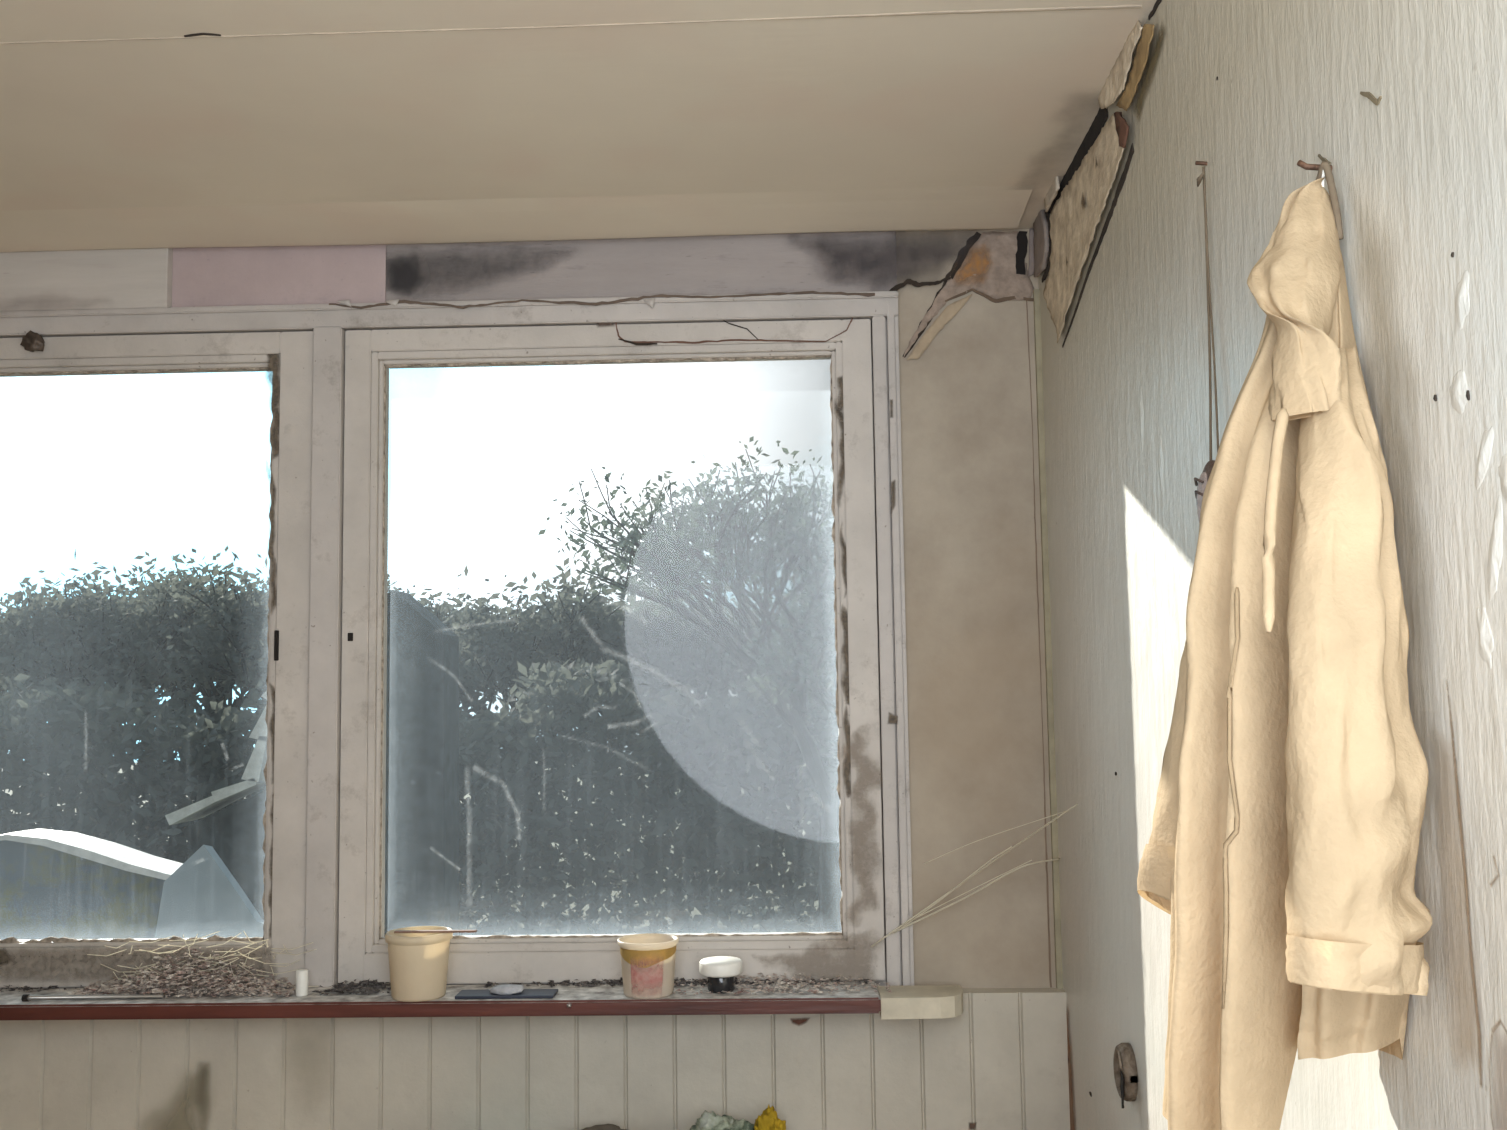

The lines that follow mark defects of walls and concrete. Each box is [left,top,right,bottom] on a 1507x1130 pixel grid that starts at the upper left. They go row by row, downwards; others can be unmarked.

peeling [1028,20,1163,283]
leakage [393,257,524,287]
crack [329,246,970,345]